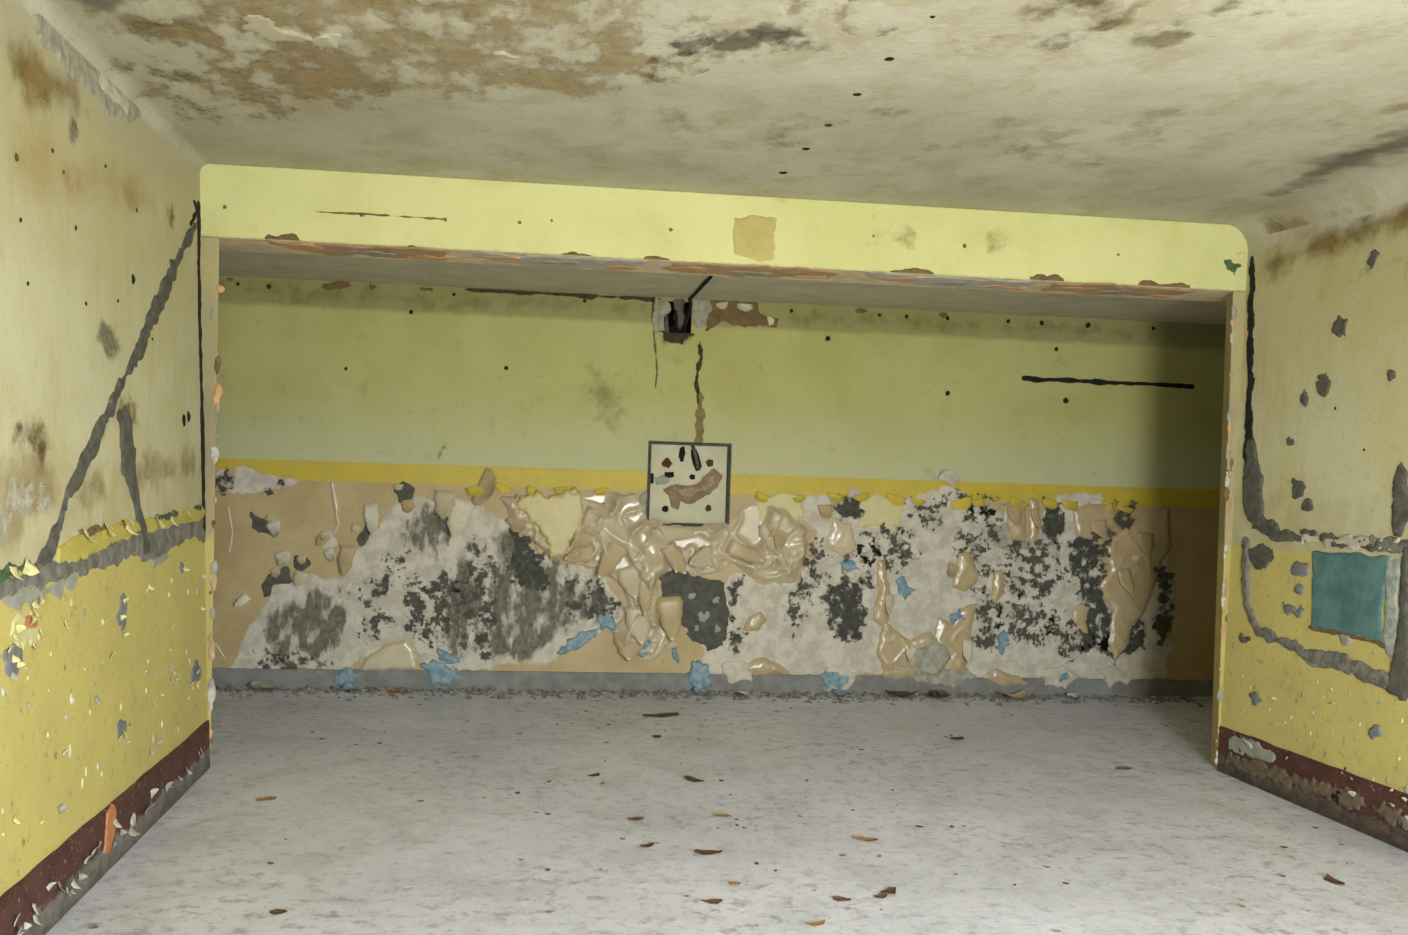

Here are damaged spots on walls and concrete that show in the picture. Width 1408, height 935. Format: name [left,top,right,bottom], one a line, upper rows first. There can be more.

water stain [103,0,809,123]
crack [322,281,376,290]
crack [420,287,661,388]
peeling [651,297,779,333]
crack [694,343,706,443]
peeling [0,558,40,584]
peeling [0,596,52,700]
peeling [57,468,623,755]
peeling [701,470,1174,691]
peeling [1282,527,1401,659]
peeling [46,729,213,896]
flaking render [1214,729,1408,830]